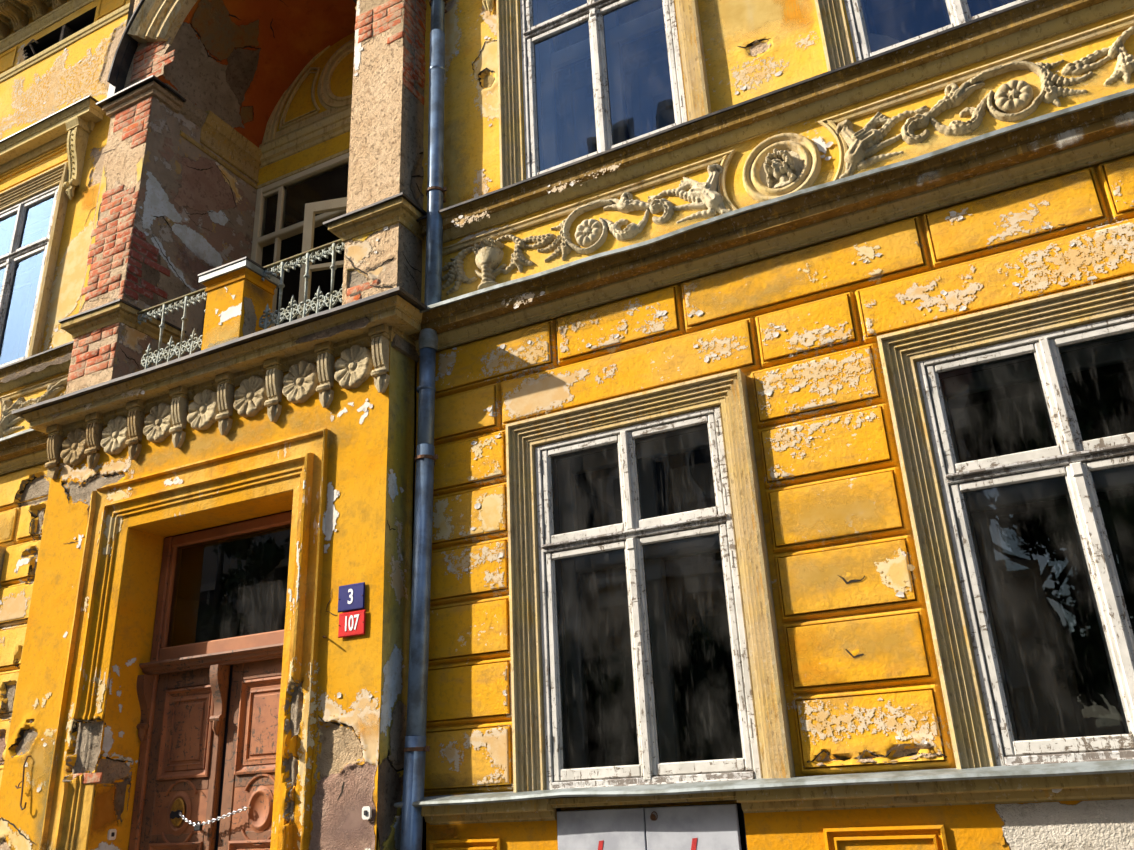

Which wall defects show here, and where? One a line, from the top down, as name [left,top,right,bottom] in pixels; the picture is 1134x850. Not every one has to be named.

spalling [130,0,261,128]
spalling [353,0,427,105]
peeling [470,5,499,126]
spalling [0,96,223,383]
peeling [344,222,400,304]
peeling [986,181,1134,303]
peeling [478,283,703,421]
spalling [0,457,134,646]
spalling [0,647,138,822]
spalling [283,644,406,850]
peeling [790,695,950,769]
spalling [994,789,1134,850]